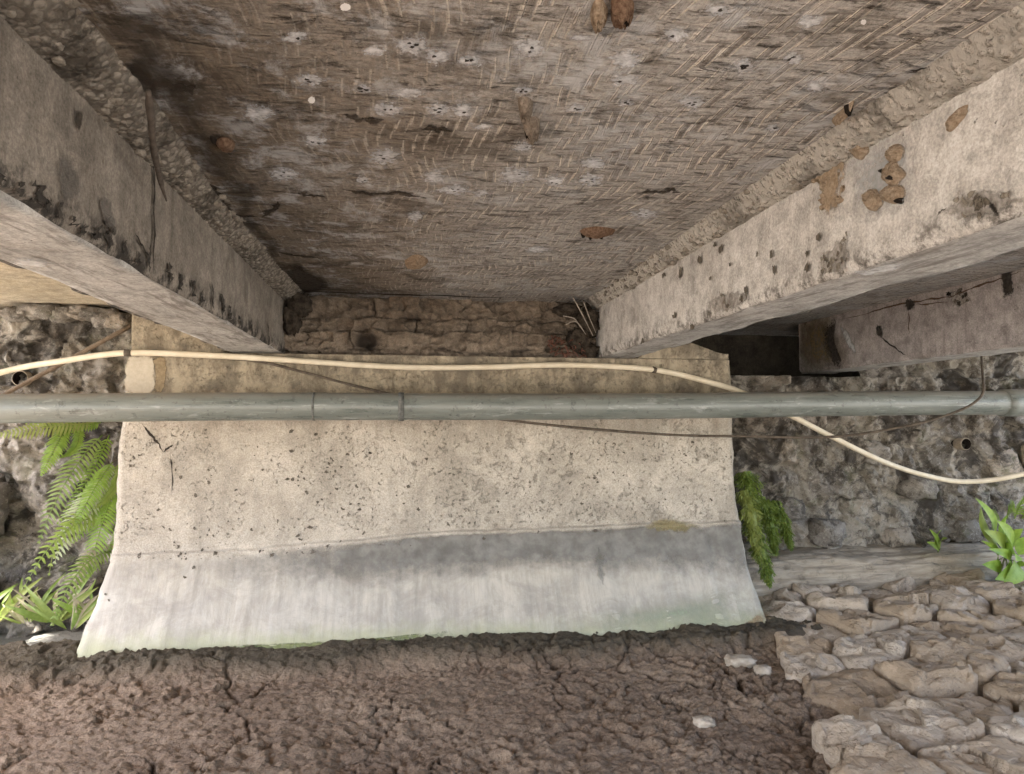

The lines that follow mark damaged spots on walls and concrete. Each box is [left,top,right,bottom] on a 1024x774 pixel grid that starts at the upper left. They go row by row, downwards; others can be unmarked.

leakage [0,159,152,272]
crack [203,175,424,217]
crack [641,186,680,194]
corrosion [811,162,845,212]
leakage [166,262,253,331]
crack [144,427,173,486]
leakage [293,525,747,574]